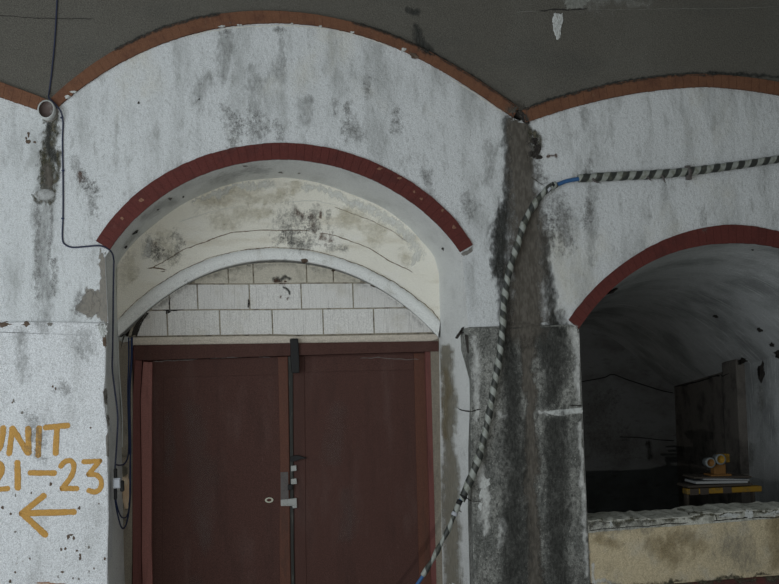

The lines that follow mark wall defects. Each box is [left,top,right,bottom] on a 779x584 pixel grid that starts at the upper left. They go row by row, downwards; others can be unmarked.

leakage [115,13,219,51]
peeling [552,0,590,40]
leakage [31,118,61,205]
crack [122,230,439,319]
leakage [353,9,779,584]